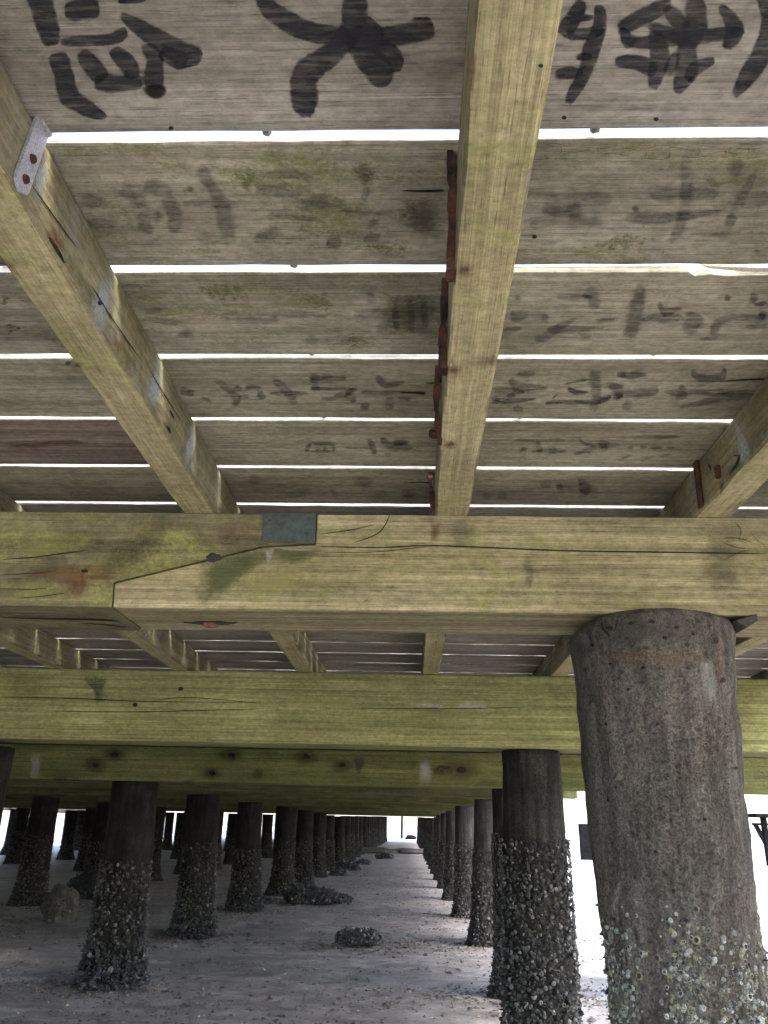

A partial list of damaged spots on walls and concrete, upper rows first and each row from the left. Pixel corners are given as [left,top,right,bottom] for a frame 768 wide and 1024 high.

crack [318,515,764,554]